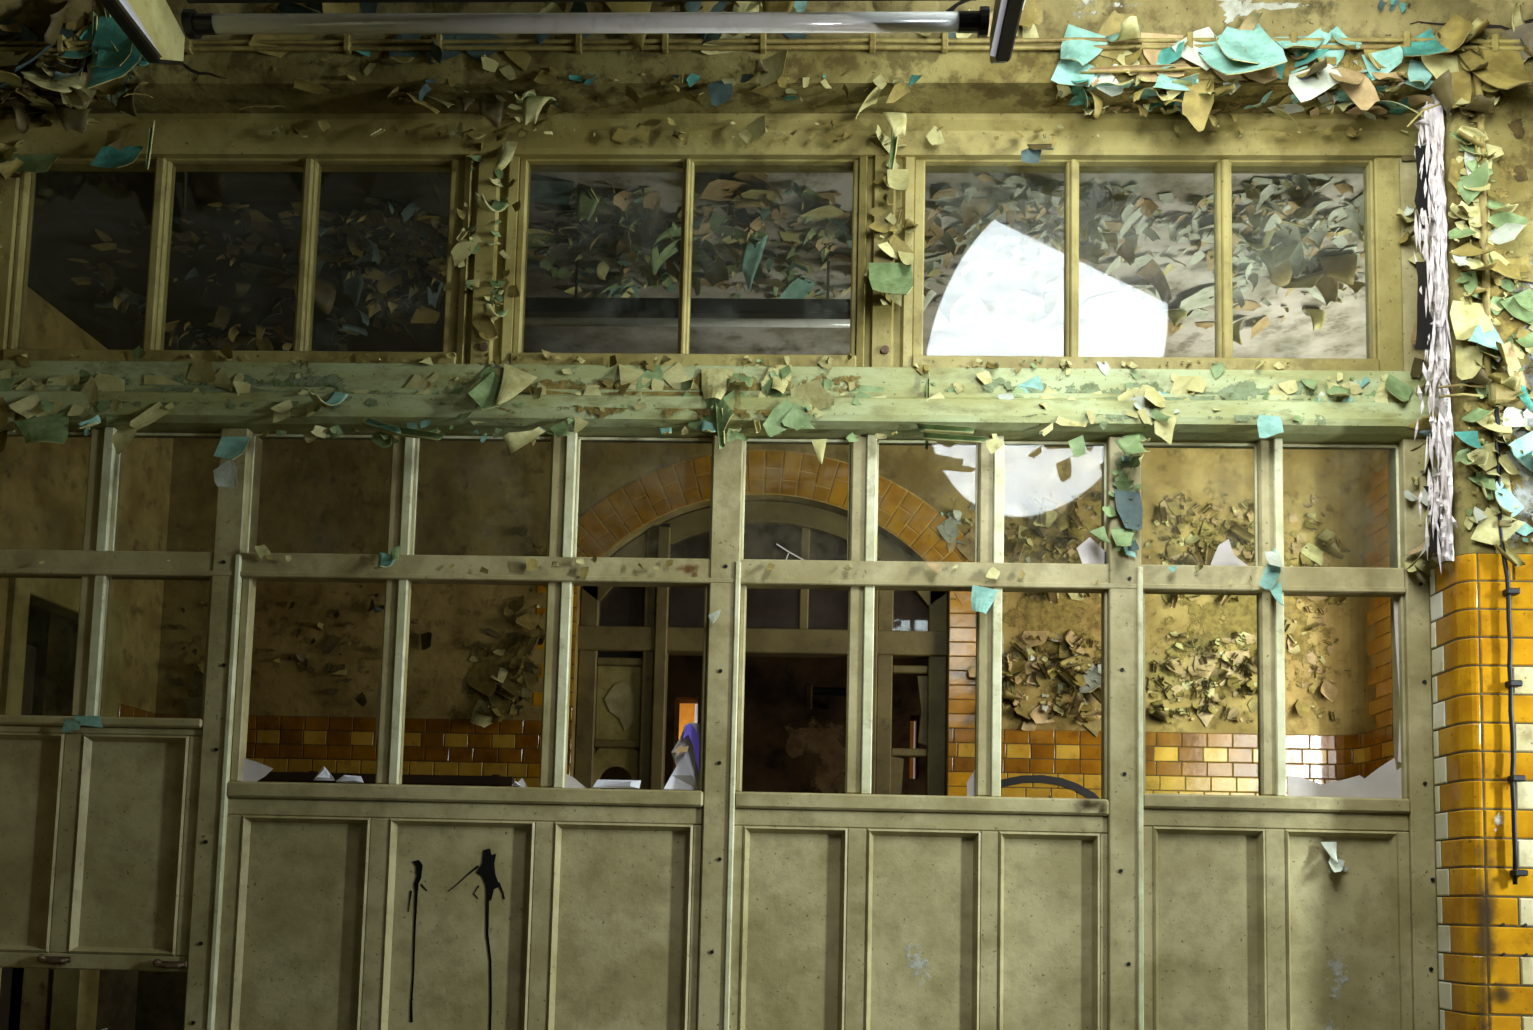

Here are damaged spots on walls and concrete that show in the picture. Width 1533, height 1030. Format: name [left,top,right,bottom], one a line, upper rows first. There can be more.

peeling [0,0,1215,488]
peeling [255,545,292,562]
peeling [61,716,103,732]
peeling [168,601,204,717]
peeling [271,585,384,707]
peeling [413,619,432,650]
peeling [457,526,599,728]
peeling [605,680,635,730]